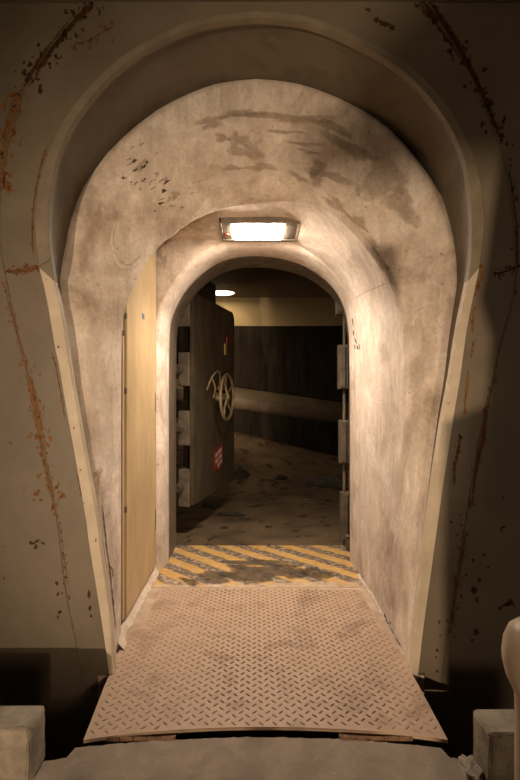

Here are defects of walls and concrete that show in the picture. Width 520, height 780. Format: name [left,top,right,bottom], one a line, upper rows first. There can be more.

rust [0,1,114,194]
rust [414,1,514,146]
rust [1,263,70,600]